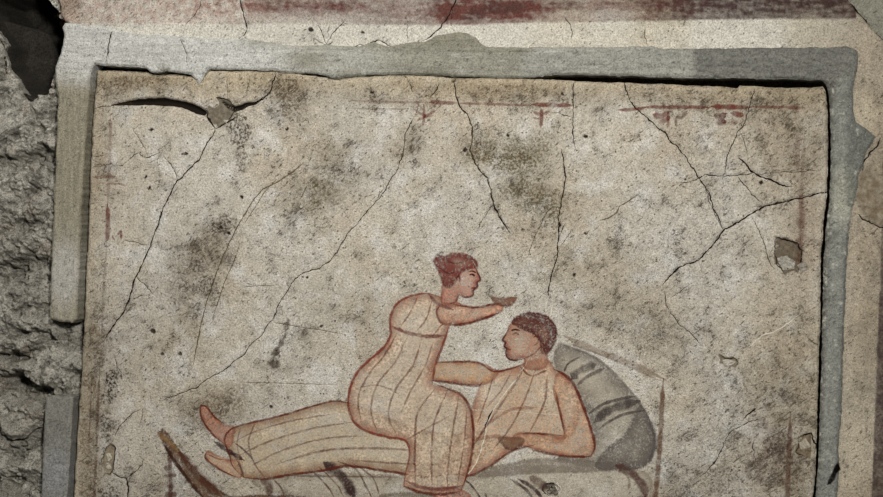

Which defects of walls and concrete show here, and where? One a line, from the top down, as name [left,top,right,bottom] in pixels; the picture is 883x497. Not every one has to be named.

spalling [0,0,67,101]
spalling [200,97,252,163]
crack [96,126,215,339]
crack [164,81,510,400]
crack [420,84,585,477]
crack [624,82,830,346]
spalling [774,236,814,274]
spalling [542,482,562,497]
crack [697,408,764,479]